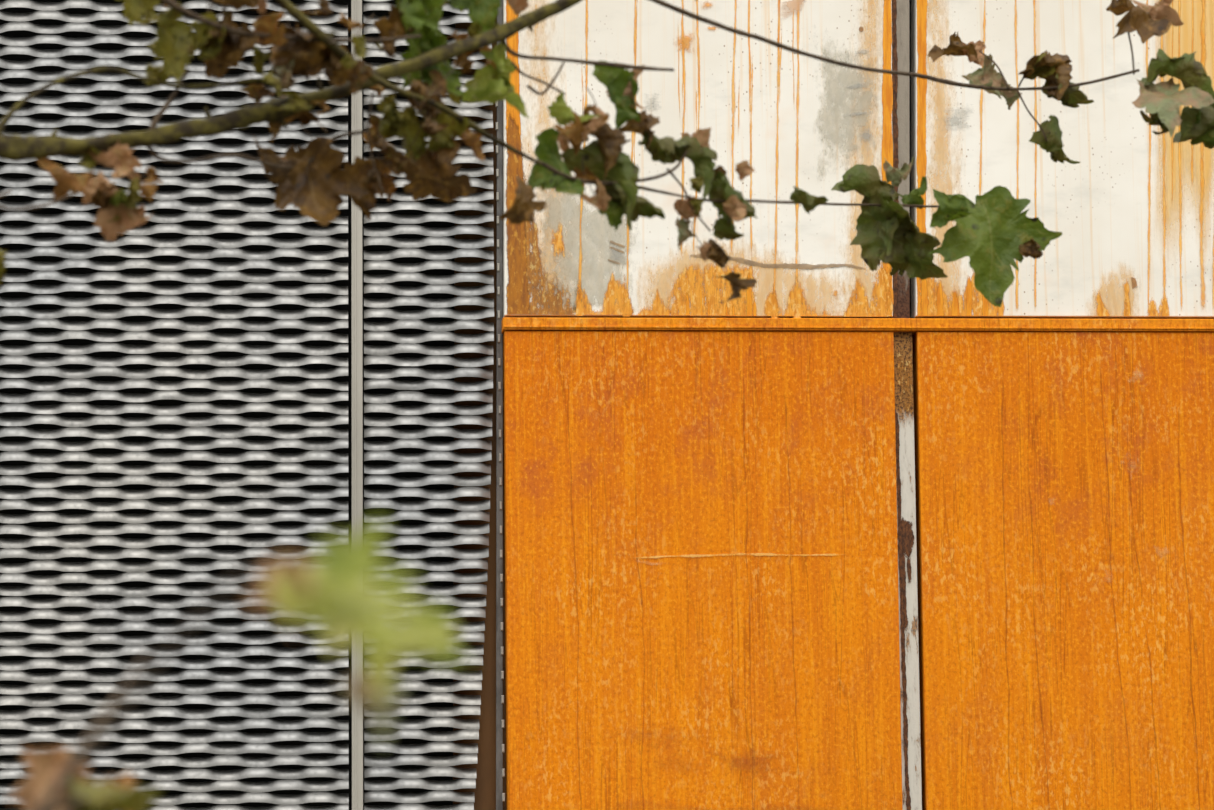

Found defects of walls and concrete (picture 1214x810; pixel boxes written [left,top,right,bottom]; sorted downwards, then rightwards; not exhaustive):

rust [506,0,899,318]
rust [916,0,1018,316]
rust [1096,75,1214,316]
rust [1146,0,1214,90]
rust [895,352,914,810]